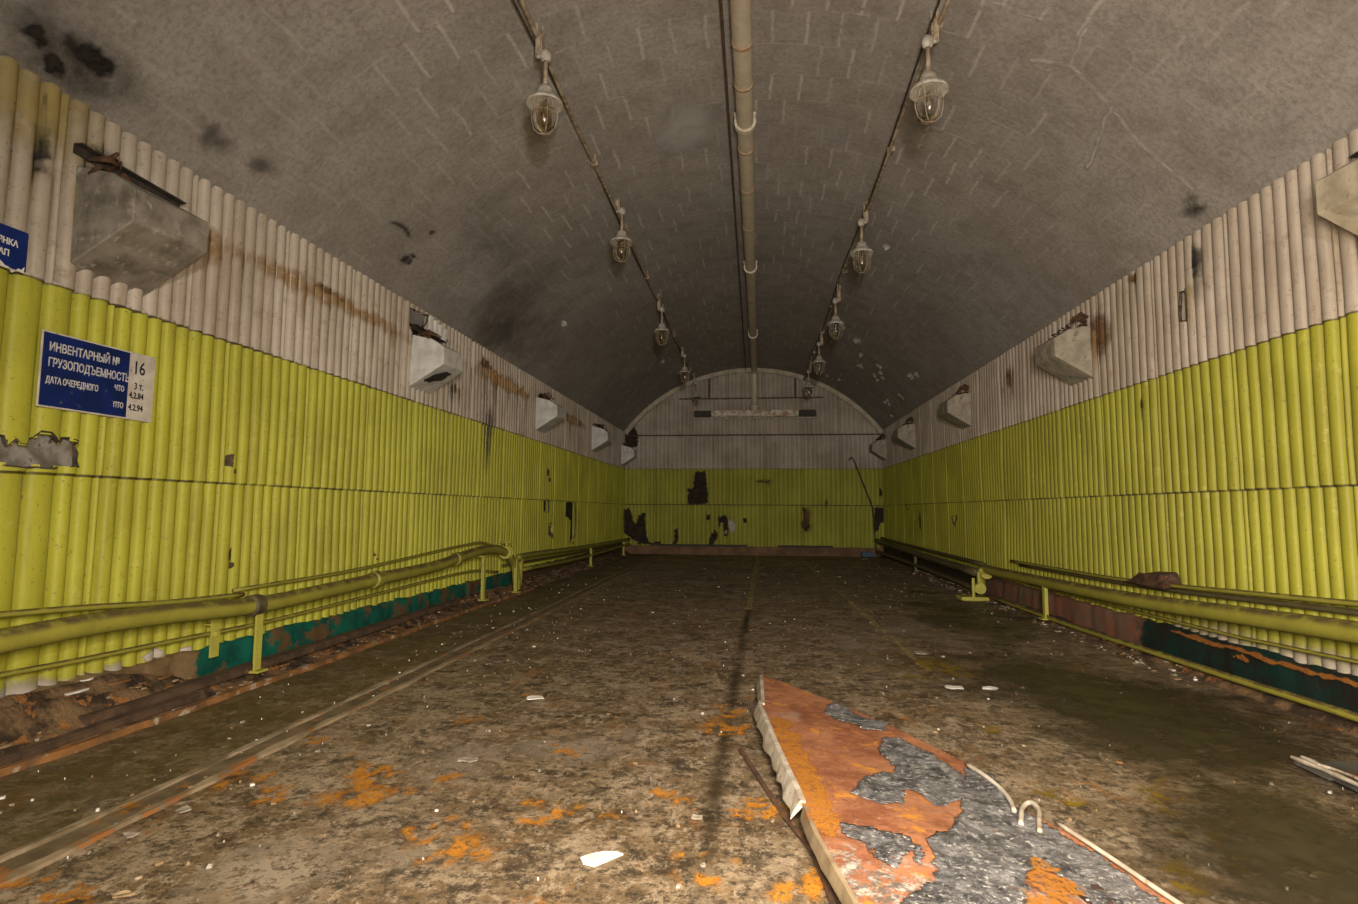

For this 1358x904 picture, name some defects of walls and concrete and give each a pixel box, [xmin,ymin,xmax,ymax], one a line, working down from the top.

leakage [0,56,79,154]
rust [258,261,397,335]
rust [1090,315,1111,353]
rust [478,358,527,399]
spalling [0,430,80,488]
spalling [623,508,679,545]
spalling [687,471,747,544]
peeling [1171,623,1358,687]